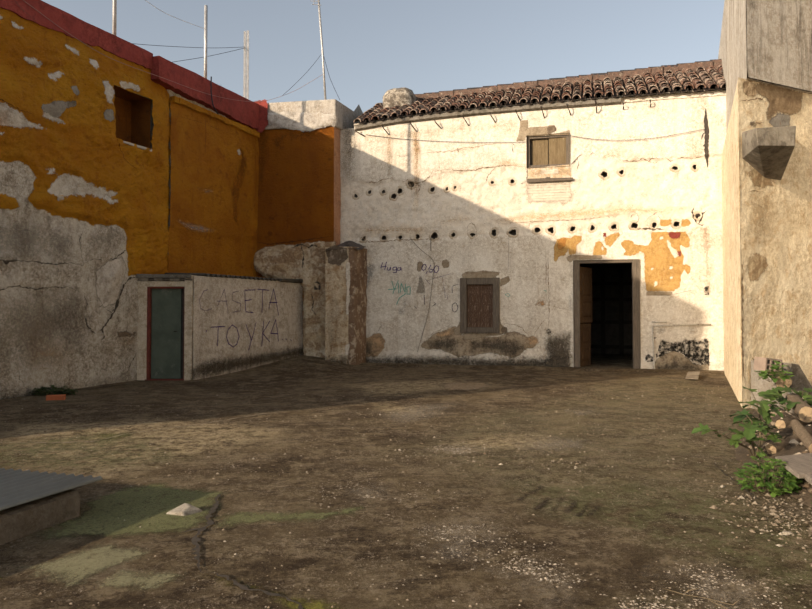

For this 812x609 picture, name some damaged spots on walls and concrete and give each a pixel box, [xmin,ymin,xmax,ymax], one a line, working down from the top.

peeling [0,86,80,135]
peeling [0,193,19,210]
peeling [46,165,118,204]
crack [366,143,528,190]
peeling [553,219,691,296]
crack [0,234,135,340]
spalling [366,333,385,357]
spalling [421,322,538,358]